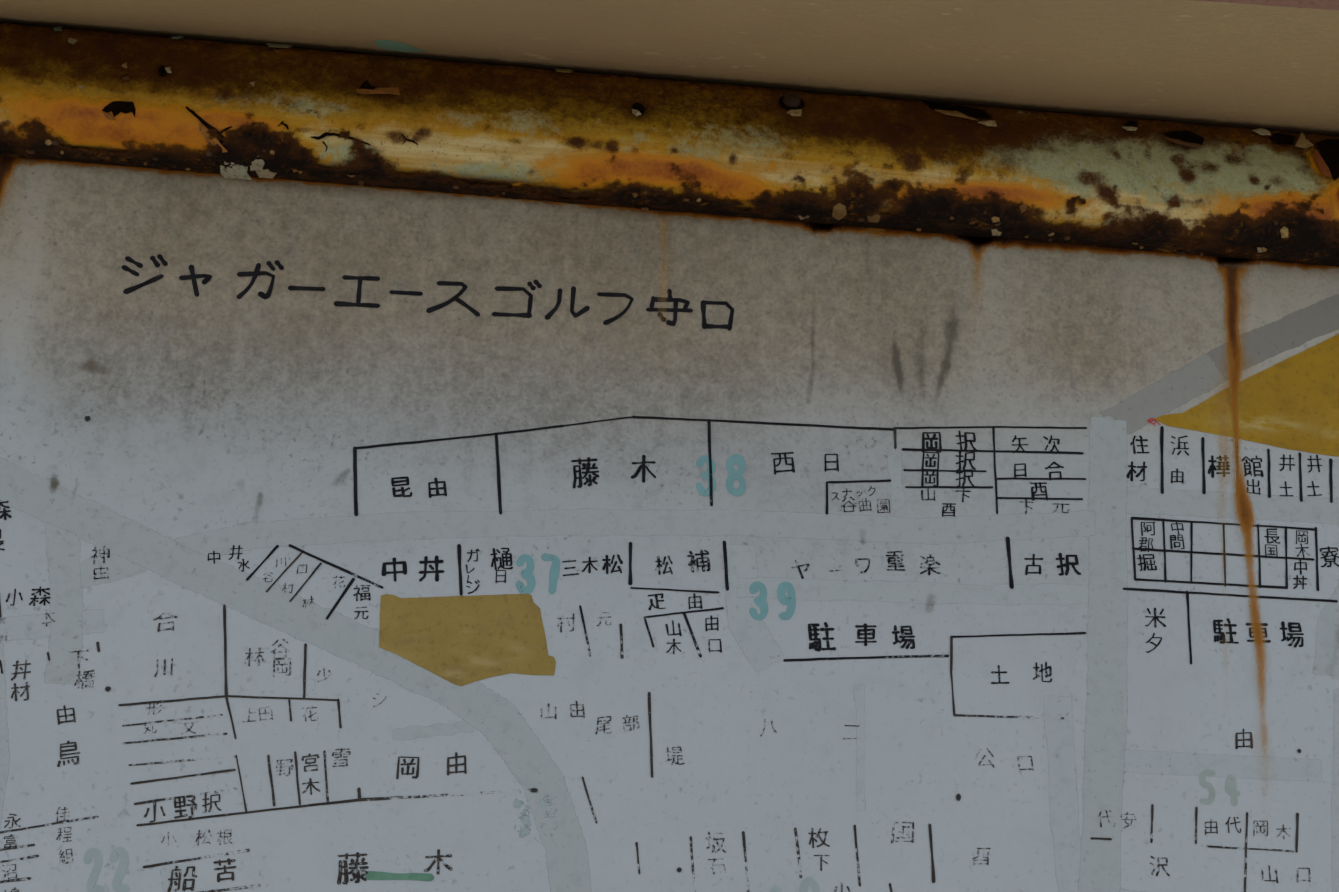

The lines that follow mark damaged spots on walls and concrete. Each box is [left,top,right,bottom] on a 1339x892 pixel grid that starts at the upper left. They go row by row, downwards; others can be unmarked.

peeling [220,156,276,180]
peeling [1295,131,1332,178]
rust [0,26,1339,701]
water stain [893,342,903,389]
water stain [939,320,956,386]